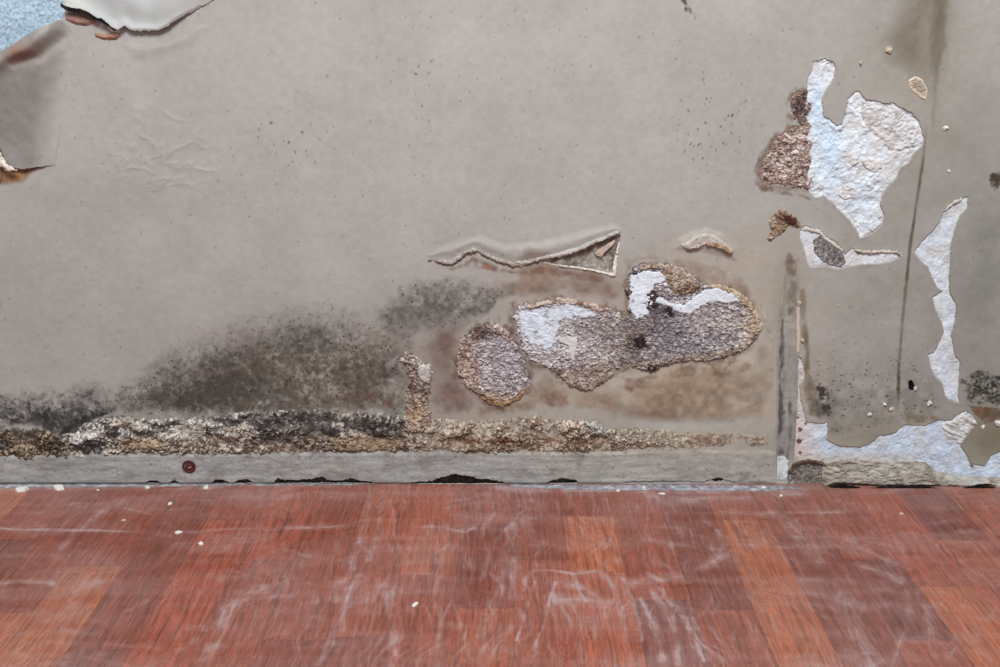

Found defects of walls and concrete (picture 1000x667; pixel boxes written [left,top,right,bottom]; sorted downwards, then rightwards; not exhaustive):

peeling [0,0,213,183]
flaking render [759,59,924,269]
flaking render [908,76,928,100]
damp [0,325,769,460]
damp [385,260,556,328]
spalling [427,230,764,409]
flaking render [787,197,1000,487]
damp [963,371,1000,404]